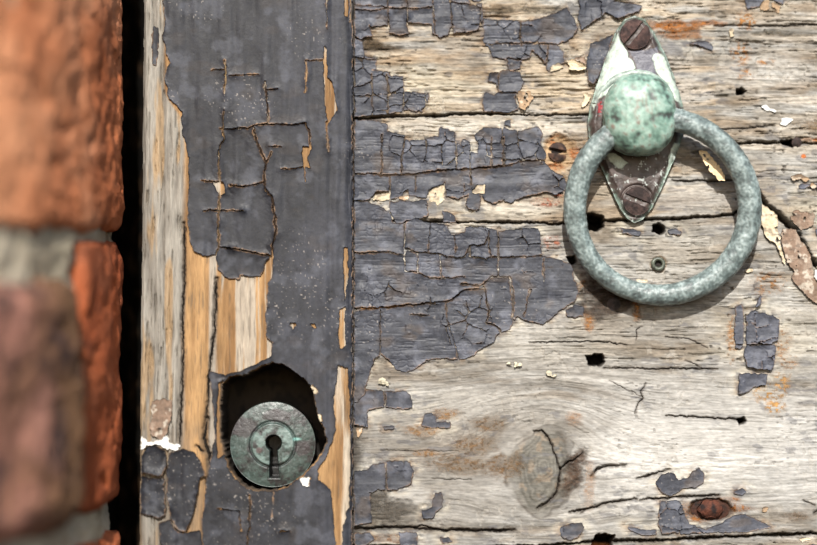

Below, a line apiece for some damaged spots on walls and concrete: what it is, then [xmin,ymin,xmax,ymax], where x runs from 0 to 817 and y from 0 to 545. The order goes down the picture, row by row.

crack [202,61,311,257]
peeling [791,173,817,189]
peeling [140,0,642,545]
crack [669,413,738,421]
crack [535,430,577,507]
crack [593,465,623,474]
crack [571,494,717,512]
peeling [628,468,772,535]